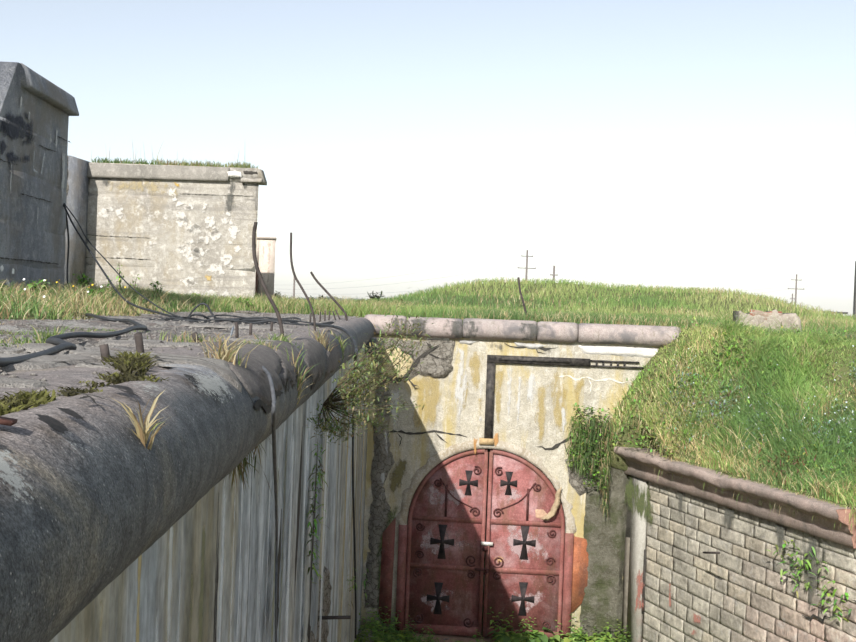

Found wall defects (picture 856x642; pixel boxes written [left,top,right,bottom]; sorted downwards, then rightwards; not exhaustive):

water stain [447,321,478,341]
peeling [514,342,546,350]
water stain [455,349,466,414]
crack [390,430,466,446]
water stain [381,460,407,492]
spalling [364,337,477,609]
crack [801,614,831,624]